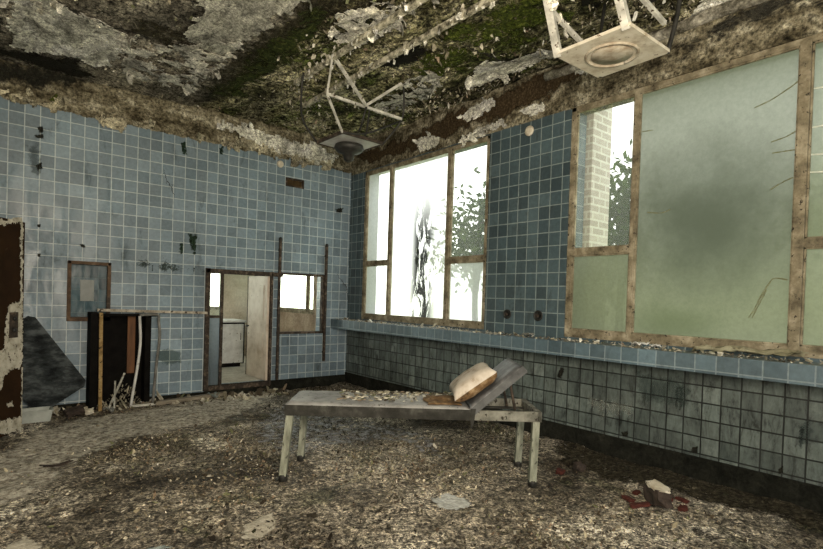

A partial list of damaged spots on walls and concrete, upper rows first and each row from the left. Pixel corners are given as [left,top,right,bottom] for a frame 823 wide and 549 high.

peeling [0,88,67,113]
water stain [0,49,96,90]
peeling [95,114,156,133]
peeling [0,0,312,101]
water stain [203,0,387,92]
spalling [217,0,583,171]
spalling [540,0,619,45]
peeling [0,217,24,435]